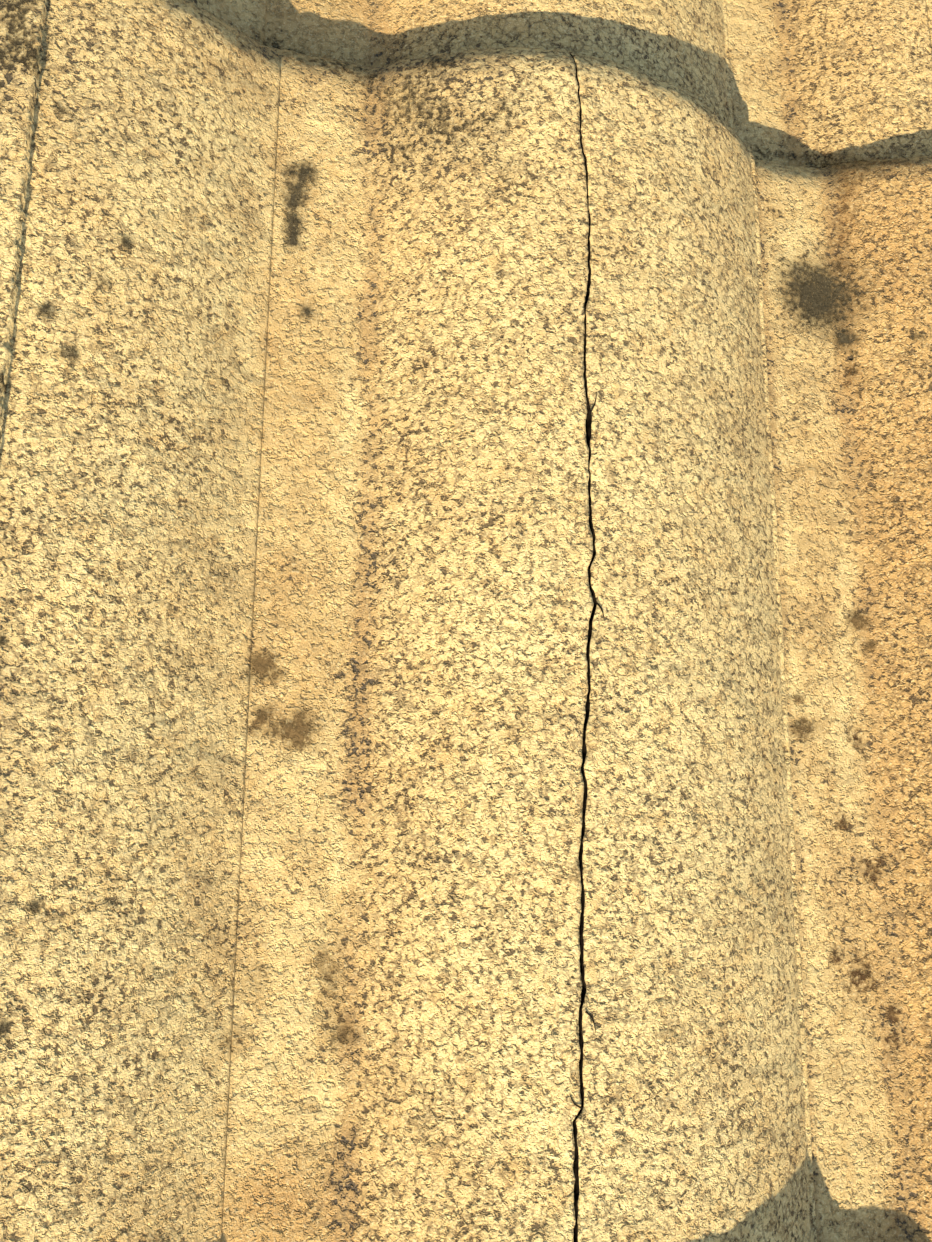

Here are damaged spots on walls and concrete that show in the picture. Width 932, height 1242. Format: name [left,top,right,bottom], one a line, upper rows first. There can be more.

damp [284,166,313,246]
damp [783,263,860,353]
crack [569,54,604,1242]